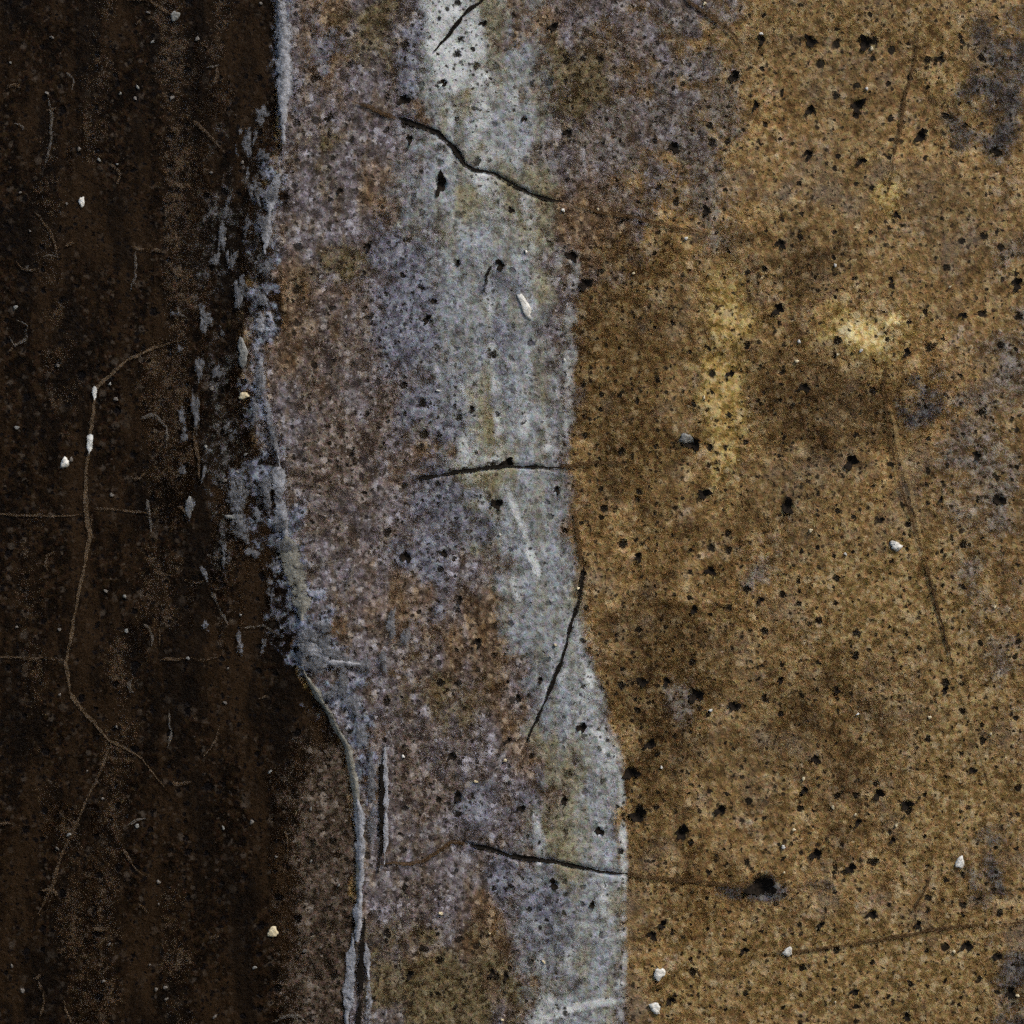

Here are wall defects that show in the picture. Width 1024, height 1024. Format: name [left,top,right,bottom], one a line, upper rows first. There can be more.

crack [433,0,483,52]
crack [352,101,717,236]
leakage [703,323,936,459]
leakage [0,0,746,1024]
crack [415,461,630,480]
crack [528,504,585,739]
crack [377,739,748,887]